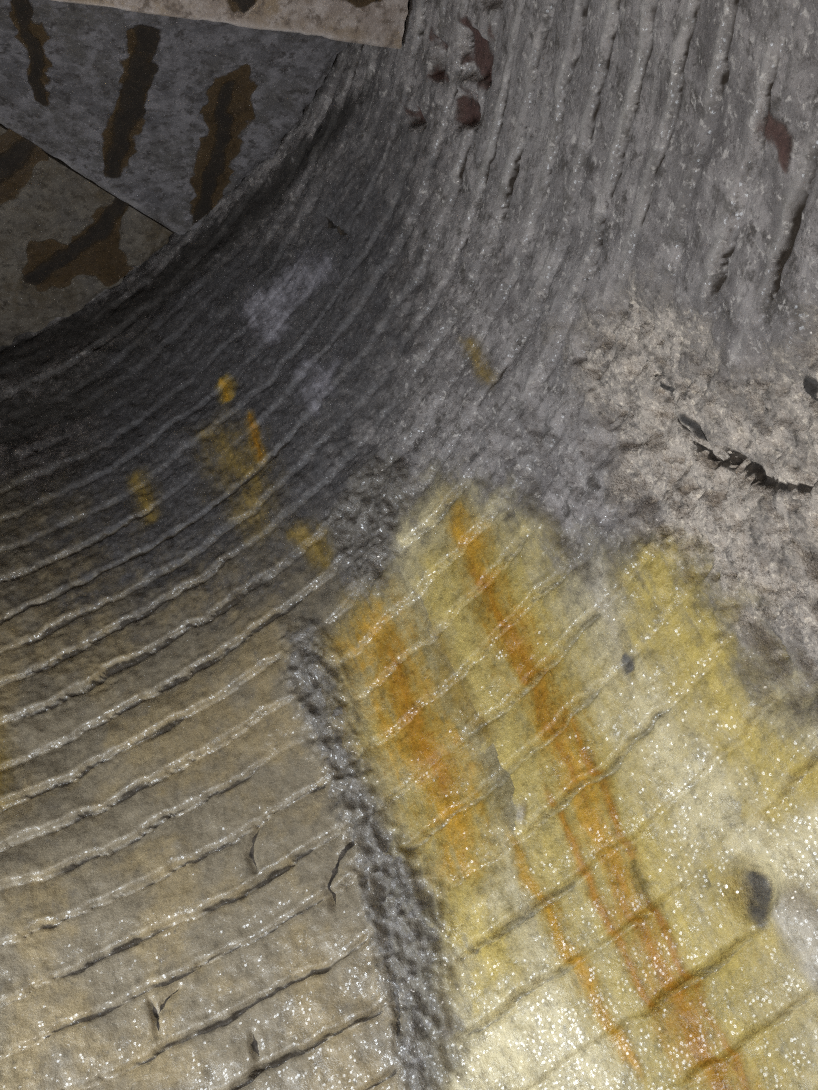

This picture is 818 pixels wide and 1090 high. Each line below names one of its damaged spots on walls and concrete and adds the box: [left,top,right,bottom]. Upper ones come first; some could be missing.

corrosion [218,378,233,402]
crack [673,396,816,509]
corrosion [335,600,491,880]
corrosion [447,501,786,1090]